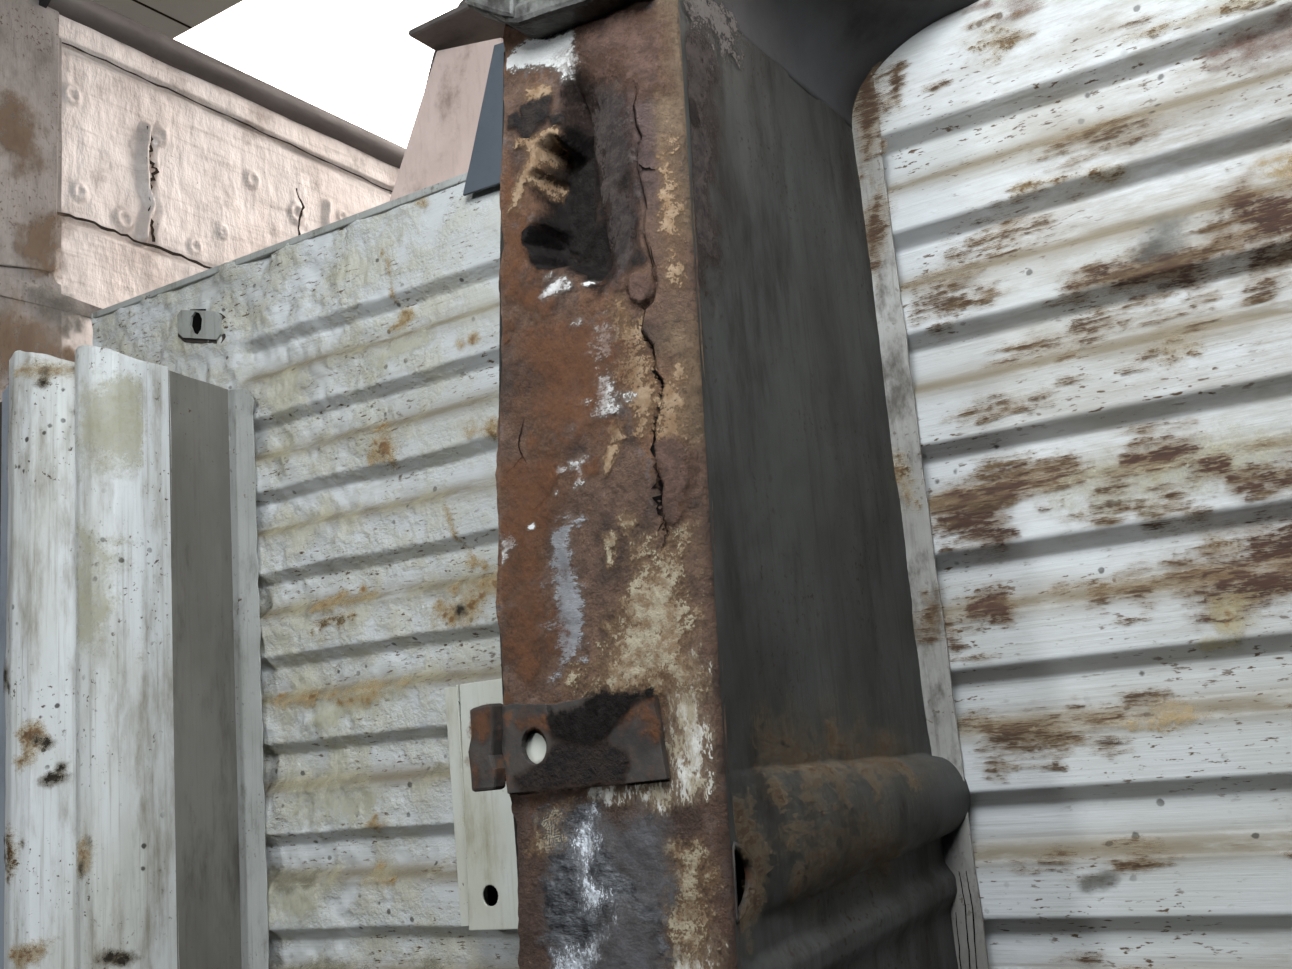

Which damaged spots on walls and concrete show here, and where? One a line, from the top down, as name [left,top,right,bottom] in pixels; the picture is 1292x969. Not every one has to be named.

leakage [0,90,43,173]
rust [906,114,1179,335]
crack [617,91,668,551]
rust [949,163,1292,428]
rust [892,419,1292,634]
rust [914,586,1022,661]
rust [16,721,53,769]
rust [957,688,1175,783]
rust [4,828,23,882]
rust [77,840,90,875]